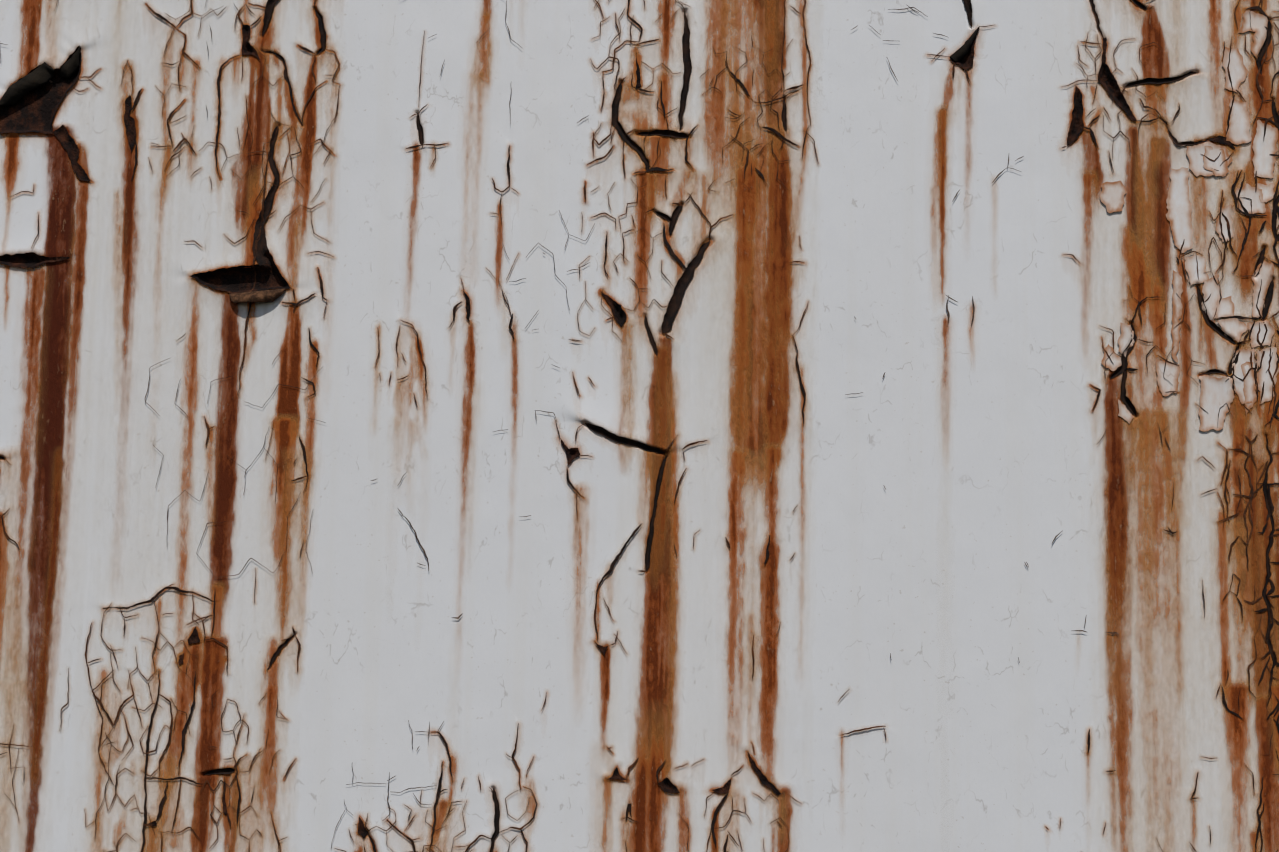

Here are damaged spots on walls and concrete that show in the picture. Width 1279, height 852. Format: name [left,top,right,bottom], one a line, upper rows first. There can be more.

corrosion [0,127,89,852]
peeling [0,46,101,183]
corrosion [147,0,336,852]
peeling [189,7,315,395]
crack [486,0,819,394]
corrosion [621,0,808,852]
peeling [709,742,781,852]
crack [752,622,781,678]
crack [791,301,809,424]
crack [851,0,972,81]
corrosion [1104,0,1217,852]
peeling [1061,0,1279,432]